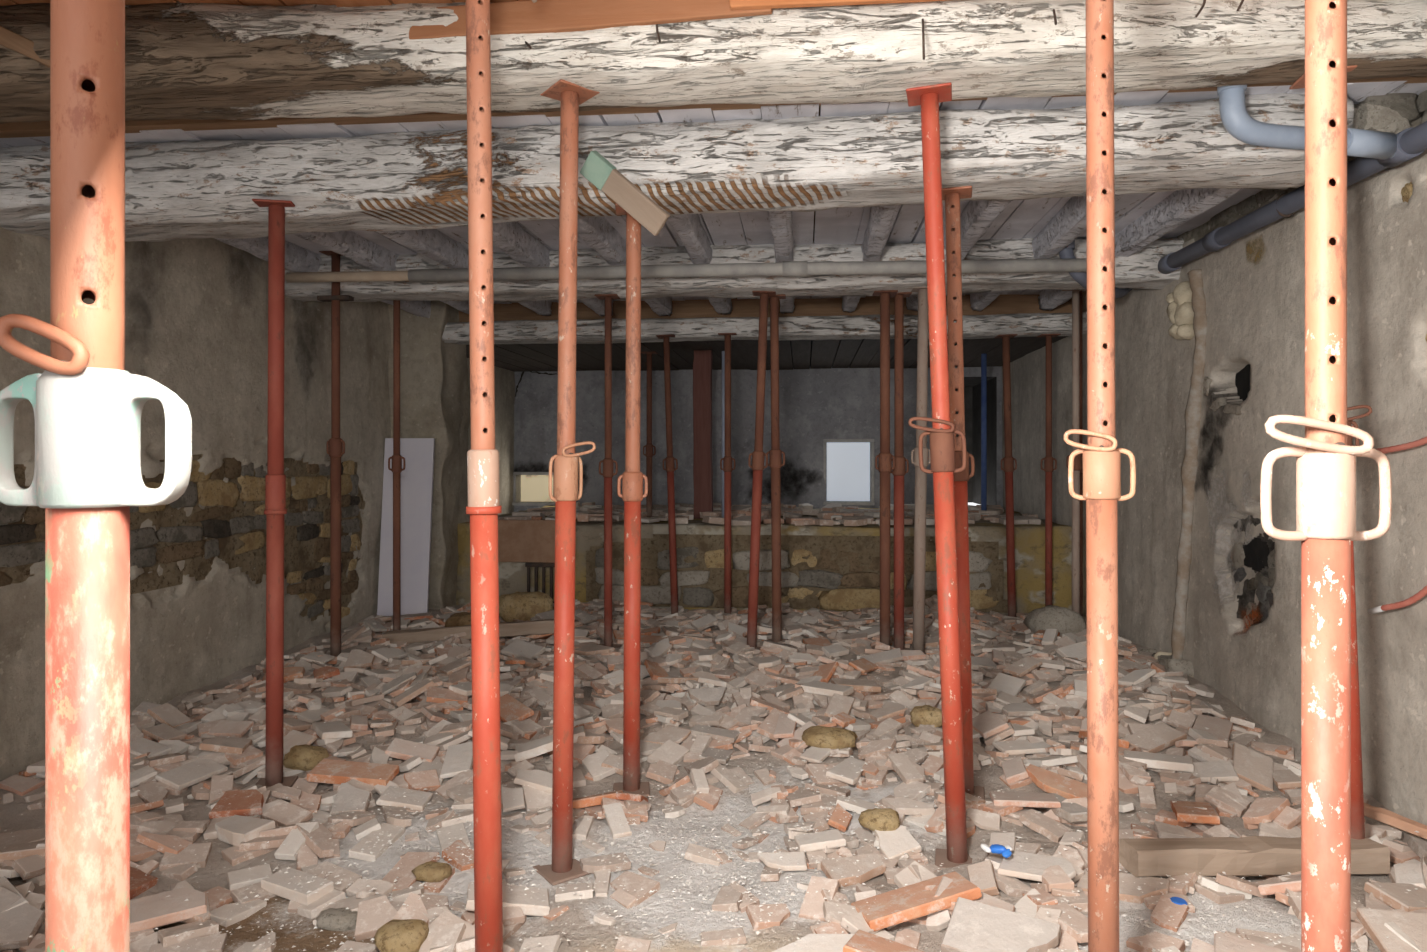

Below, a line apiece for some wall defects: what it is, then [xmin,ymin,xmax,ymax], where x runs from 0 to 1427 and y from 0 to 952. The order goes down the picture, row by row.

spalling [1203,364,1251,415]
flaking render [14,464,30,489]
flaking render [0,502,45,587]
flaking render [130,454,267,595]
flaking render [284,458,365,621]
flaking render [1228,515,1276,625]